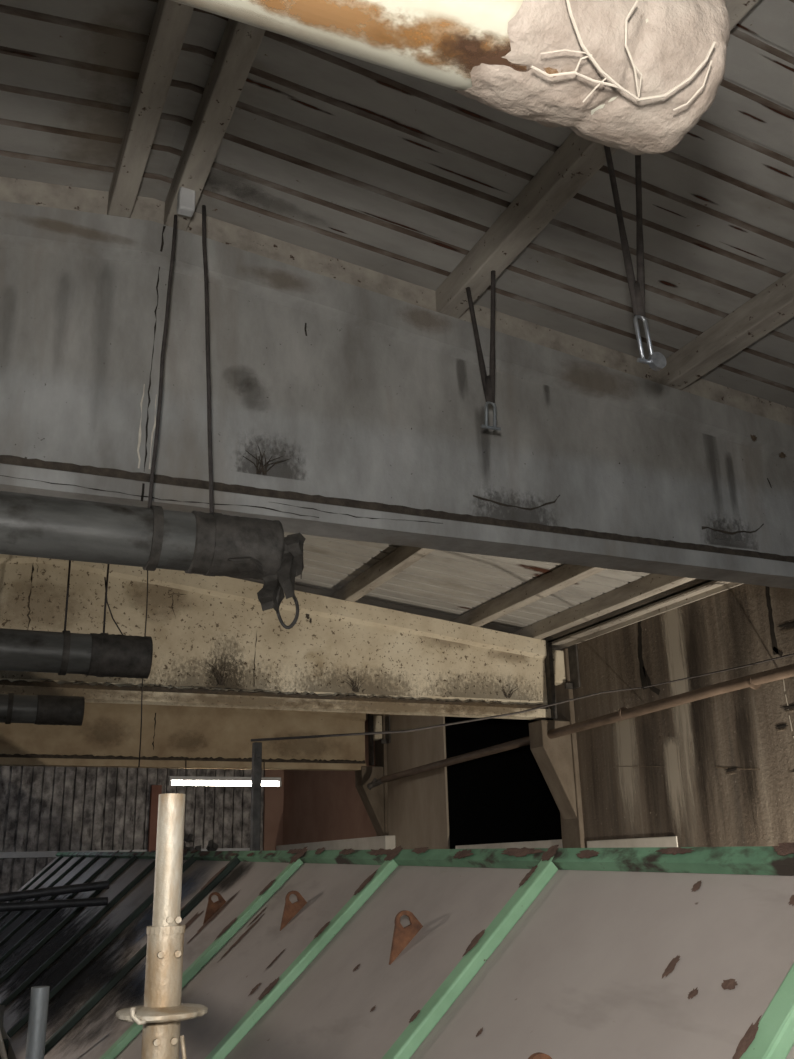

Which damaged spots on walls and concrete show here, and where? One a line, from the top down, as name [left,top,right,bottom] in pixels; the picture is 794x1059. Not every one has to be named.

corrosion [259,0,529,77]
corrosion [501,845,559,887]
corrosion [576,850,599,859]
corrosion [655,847,694,855]